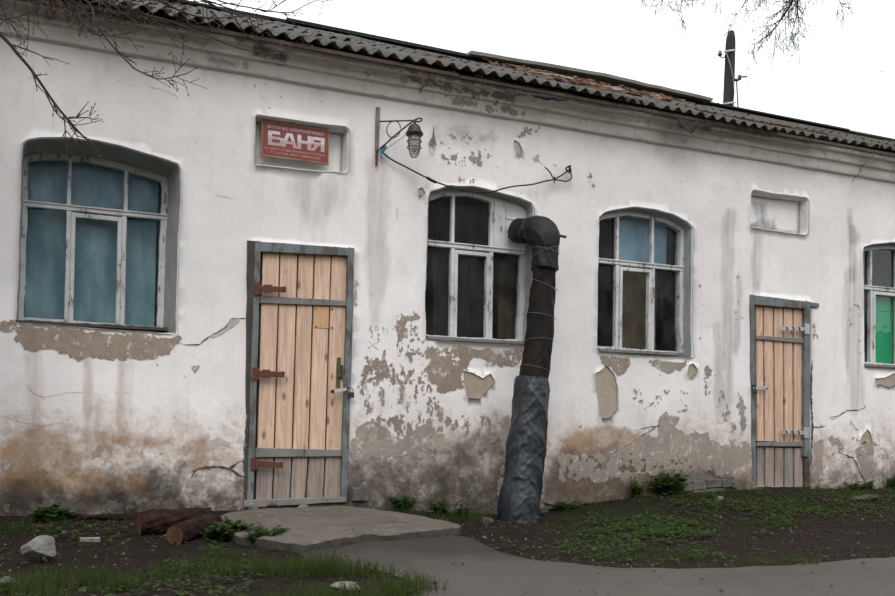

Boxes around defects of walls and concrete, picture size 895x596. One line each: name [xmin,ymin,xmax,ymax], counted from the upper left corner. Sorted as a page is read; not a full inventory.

peeling [391,62,540,156]
peeling [440,133,492,184]
peeling [0,319,182,366]
crack [178,318,246,345]
peeling [351,311,524,496]
peeling [557,355,752,493]
crack [810,361,865,463]
flaking render [875,374,895,387]
crack [190,404,249,500]
peeling [810,430,889,482]
flaking render [350,485,373,507]